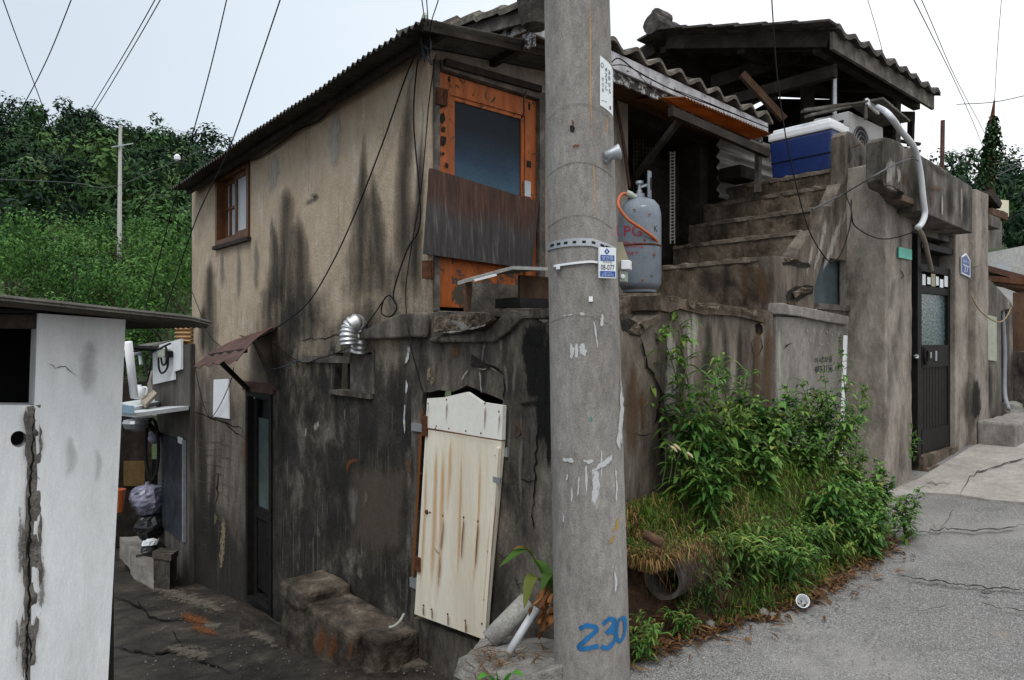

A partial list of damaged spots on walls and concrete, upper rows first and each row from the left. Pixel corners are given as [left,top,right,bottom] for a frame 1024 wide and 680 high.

leakage [267,155,311,335]
leakage [350,160,388,292]
leakage [505,324,551,464]
peeling [23,409,43,459]
peeling [21,513,42,587]
flaking render [213,514,226,567]
corrosion [408,406,502,599]
crack [521,424,540,527]
crack [913,458,1024,532]
crack [902,575,1024,611]
peeling [19,615,39,678]
crack [114,596,231,672]